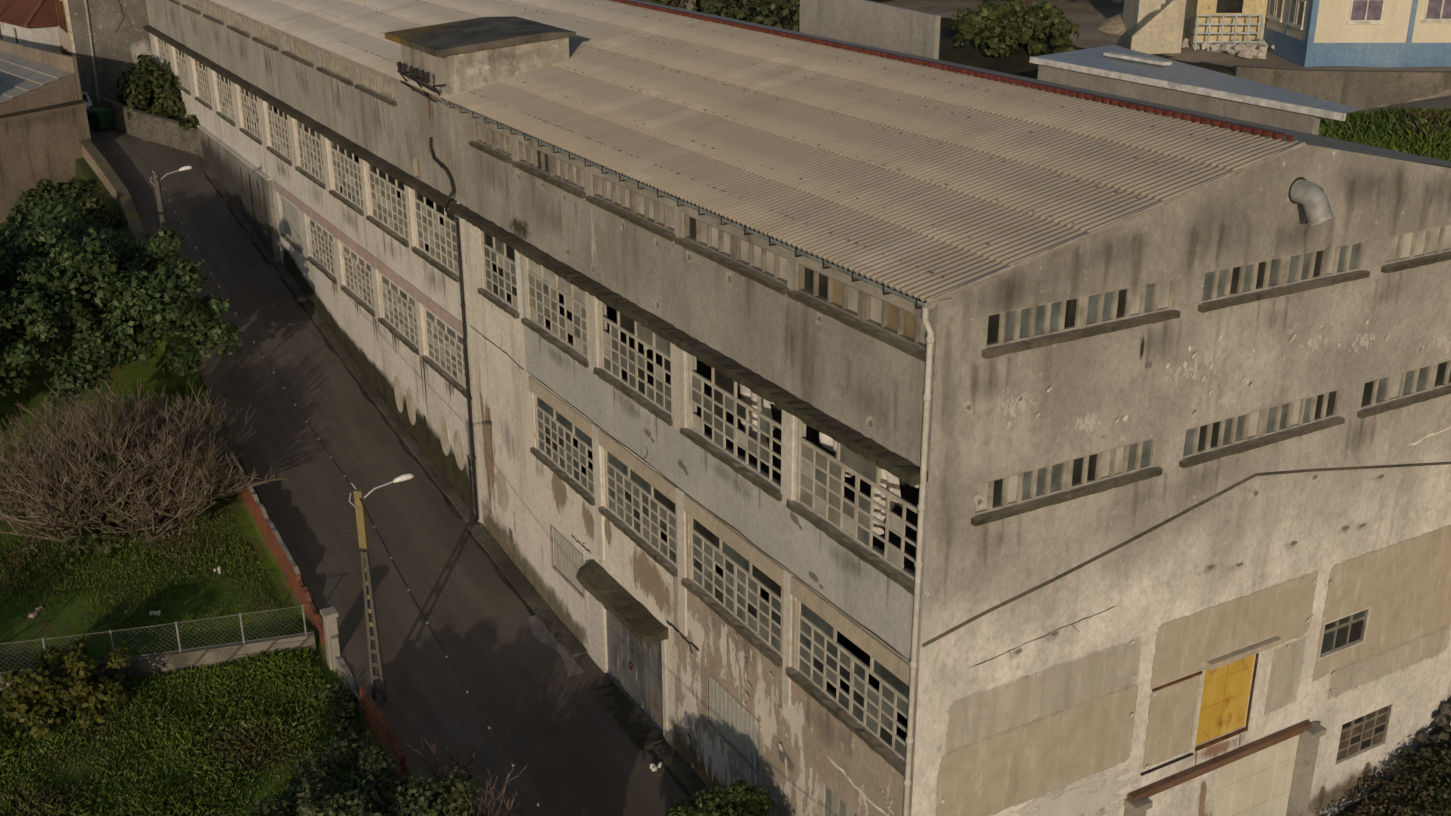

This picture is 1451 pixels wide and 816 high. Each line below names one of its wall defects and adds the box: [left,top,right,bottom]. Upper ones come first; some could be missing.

water stain [420,358,454,454]
peeling [550,472,612,546]
peeling [628,550,821,816]
crack [828,757,894,816]